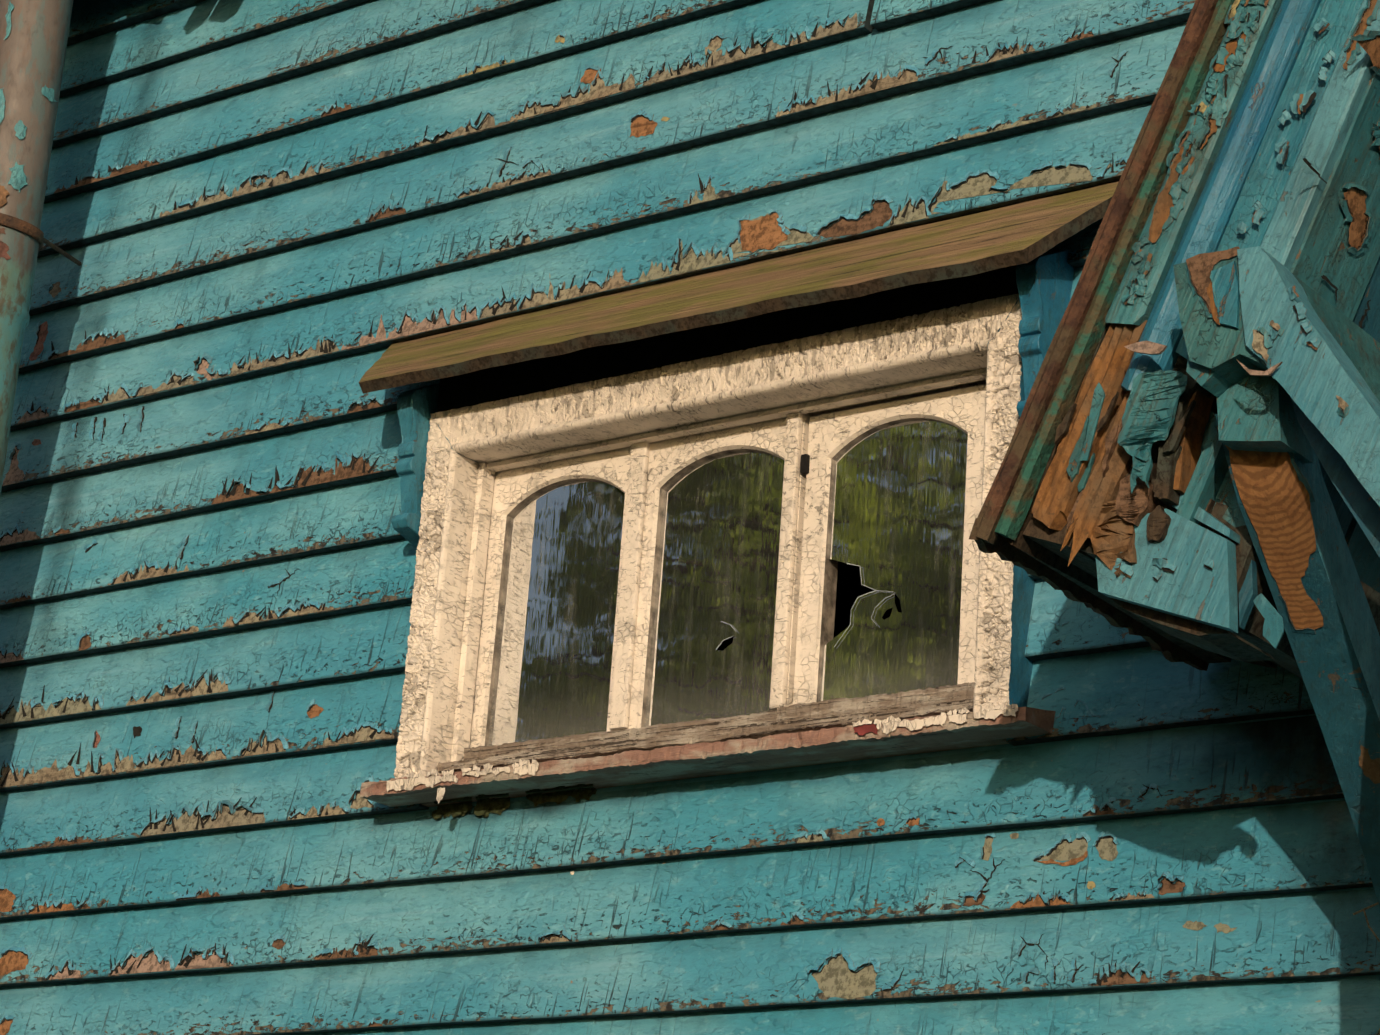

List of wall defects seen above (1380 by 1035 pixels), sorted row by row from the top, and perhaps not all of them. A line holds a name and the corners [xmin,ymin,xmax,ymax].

peeling [411,13,858,148]
peeling [776,62,920,117]
corrosion [0,228,11,260]
peeling [18,153,1128,423]
peeling [211,450,380,505]
peeling [1225,445,1323,649]
peeling [0,685,104,724]
peeling [0,726,289,788]
peeling [139,797,265,836]
crack [954,857,1005,902]
peeling [108,942,235,975]
peeling [806,948,882,999]